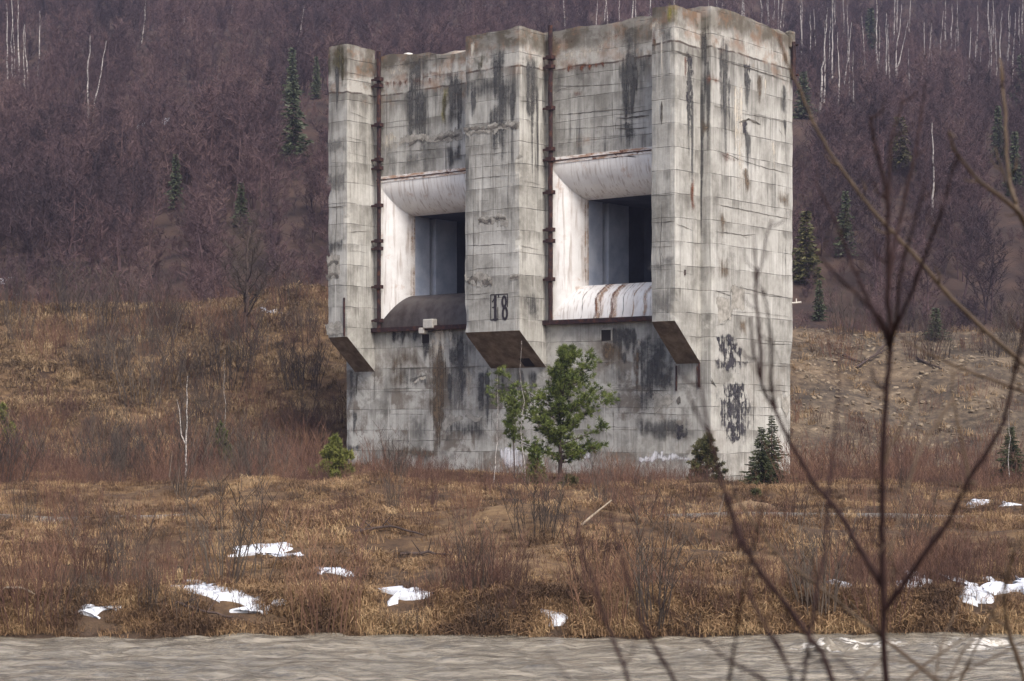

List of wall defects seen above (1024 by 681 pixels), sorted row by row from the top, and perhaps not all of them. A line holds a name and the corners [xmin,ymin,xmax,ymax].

damp [391,59,426,143]
damp [443,45,538,163]
damp [620,35,646,145]
damp [685,18,766,227]
rust [582,283,651,318]
damp [392,330,504,436]
damp [603,328,683,439]